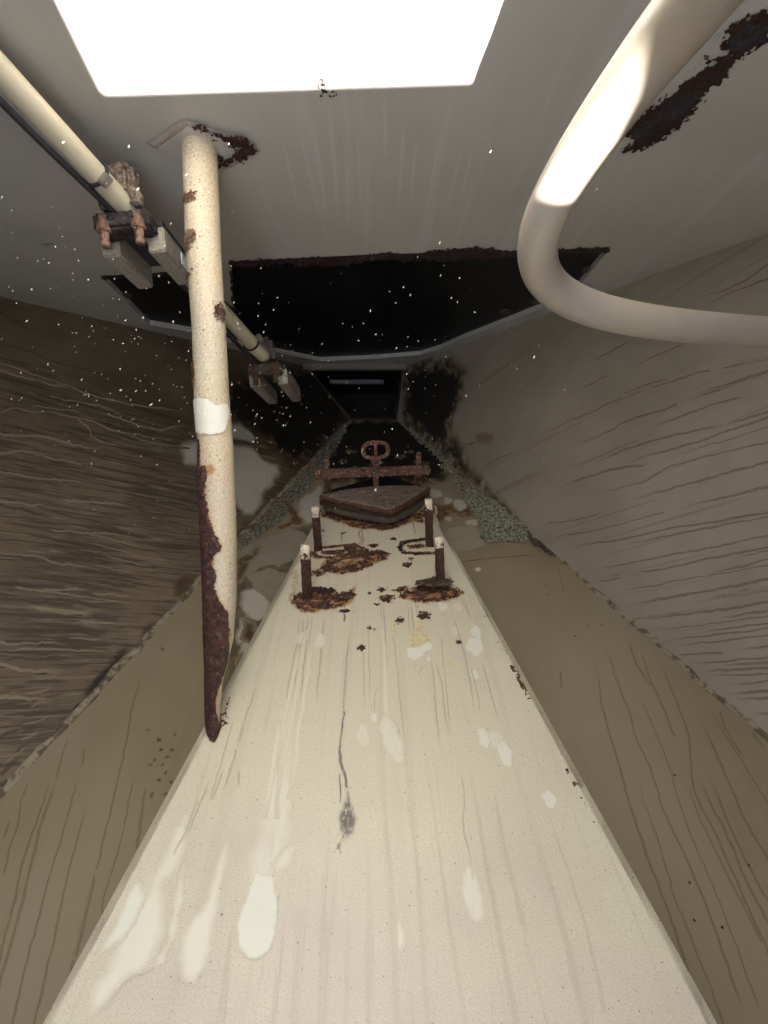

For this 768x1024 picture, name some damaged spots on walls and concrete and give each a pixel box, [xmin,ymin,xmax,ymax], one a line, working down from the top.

corrosion [171,415,232,743]
corrosion [286,502,475,625]
corrosion [82,619,157,697]